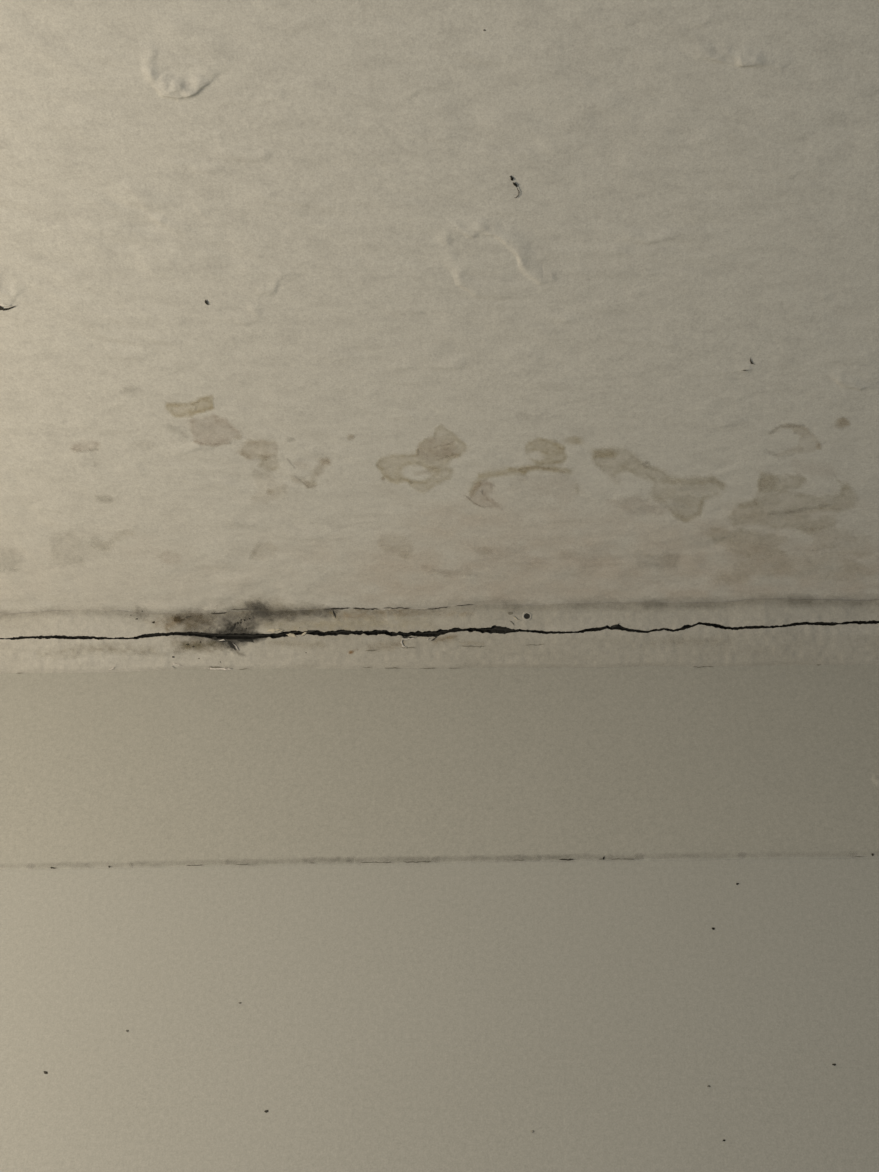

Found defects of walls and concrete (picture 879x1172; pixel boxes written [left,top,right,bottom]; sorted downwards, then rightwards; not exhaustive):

crack [0,604,879,670]